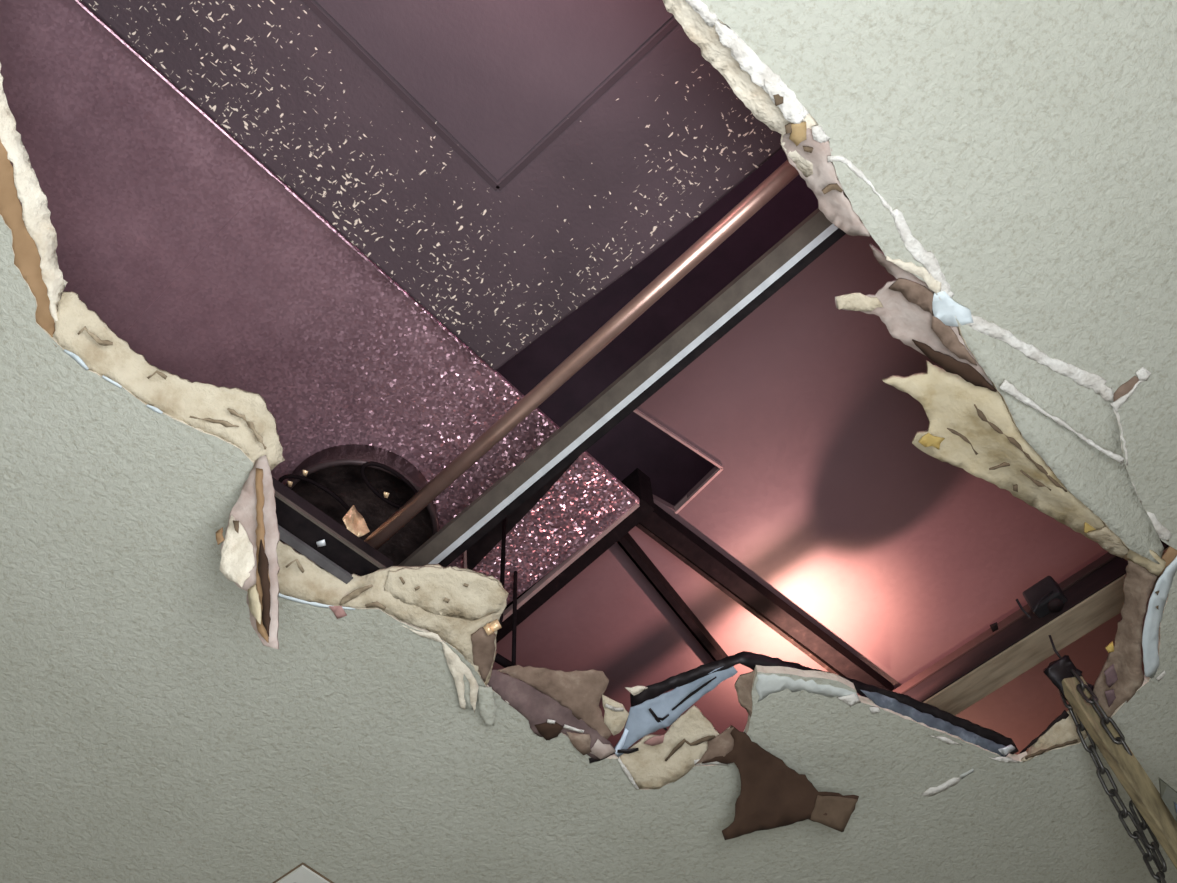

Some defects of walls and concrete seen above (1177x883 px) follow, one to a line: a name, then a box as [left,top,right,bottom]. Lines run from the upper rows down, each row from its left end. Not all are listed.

flaking render [663,0,870,236]
crack [827,155,1107,395]
flaking render [53,291,285,471]
crack [999,379,1125,464]
flaking render [882,360,1177,717]
flaking render [276,540,508,686]
flaking render [617,705,734,790]
peeling [734,670,881,718]
flaking render [988,710,1087,763]